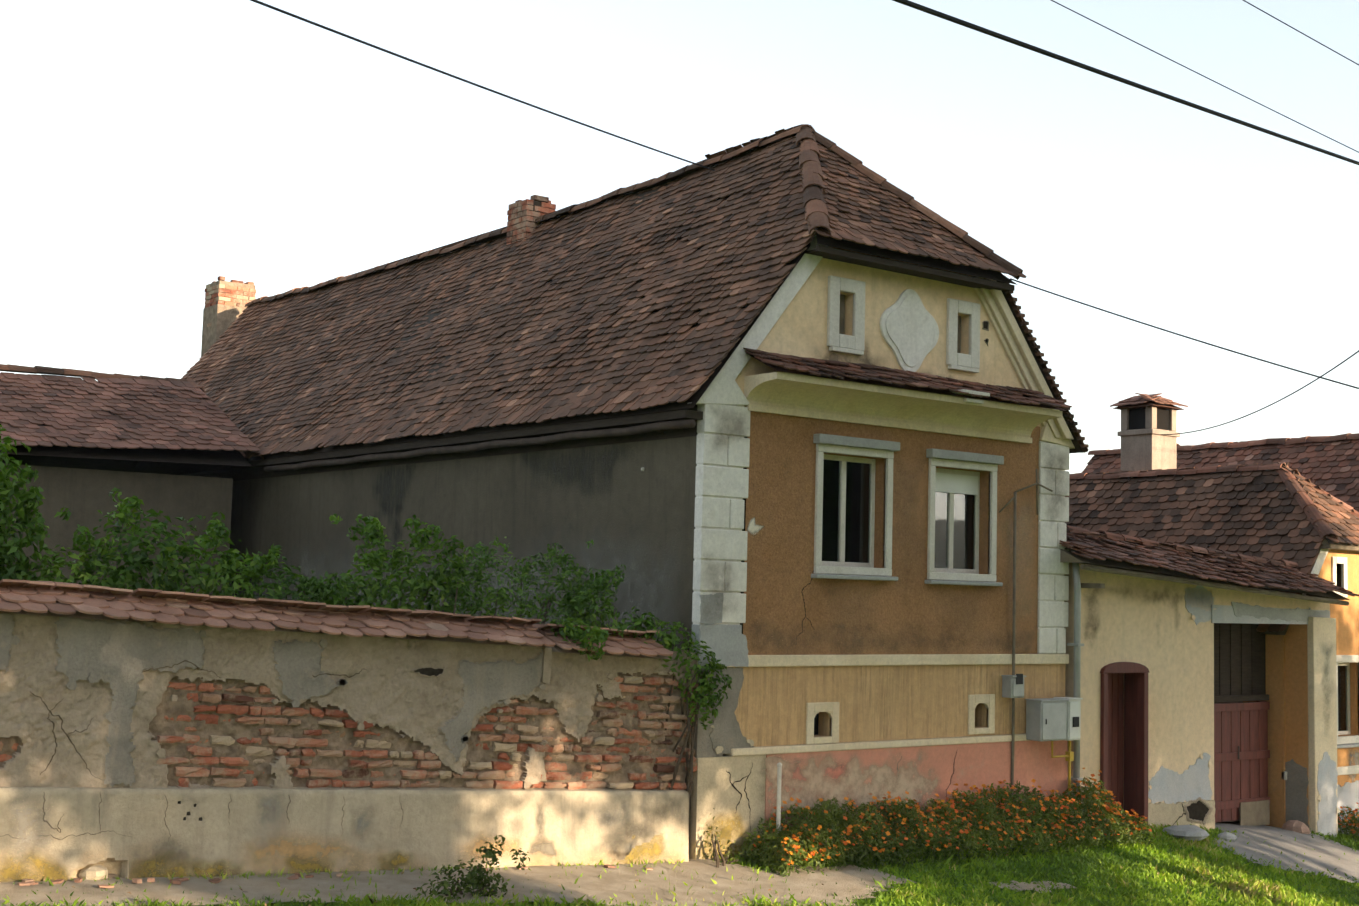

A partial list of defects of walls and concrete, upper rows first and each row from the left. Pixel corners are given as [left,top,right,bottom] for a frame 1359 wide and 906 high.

flaking render [0,736,23,768]
crack [4,691,124,840]
flaking render [54,617,696,821]
flaking render [709,667,756,754]
crack [726,764,753,831]
peeling [1148,753,1213,826]